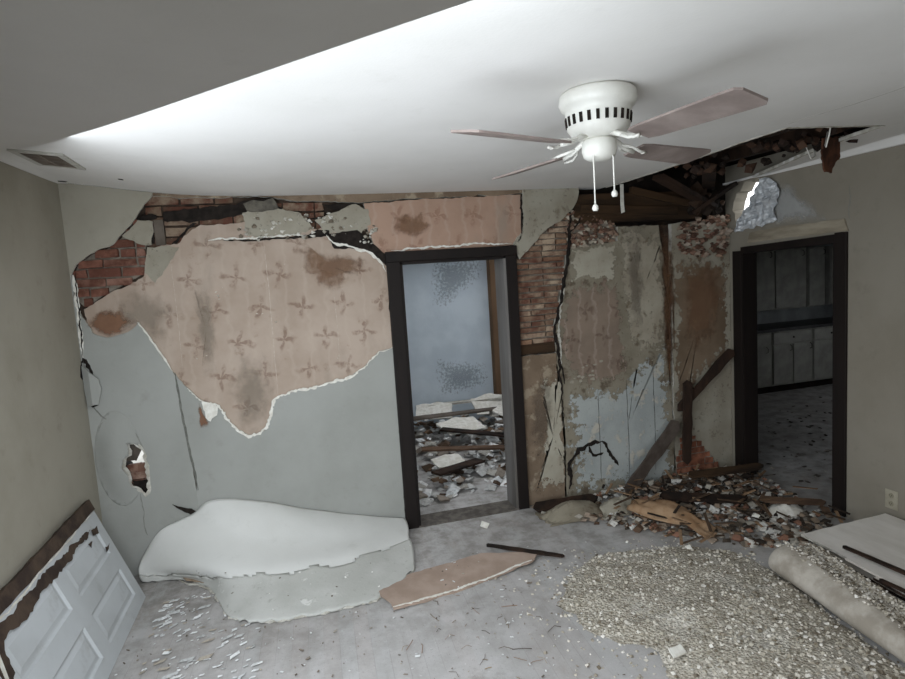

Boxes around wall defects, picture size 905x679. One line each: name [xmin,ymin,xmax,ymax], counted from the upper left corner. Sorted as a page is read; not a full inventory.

peeling [72,195,524,439]
crack [553,212,581,418]
peeling [517,210,734,496]
spalling [122,443,151,497]
crack [567,440,619,489]
peeling [0,526,99,679]